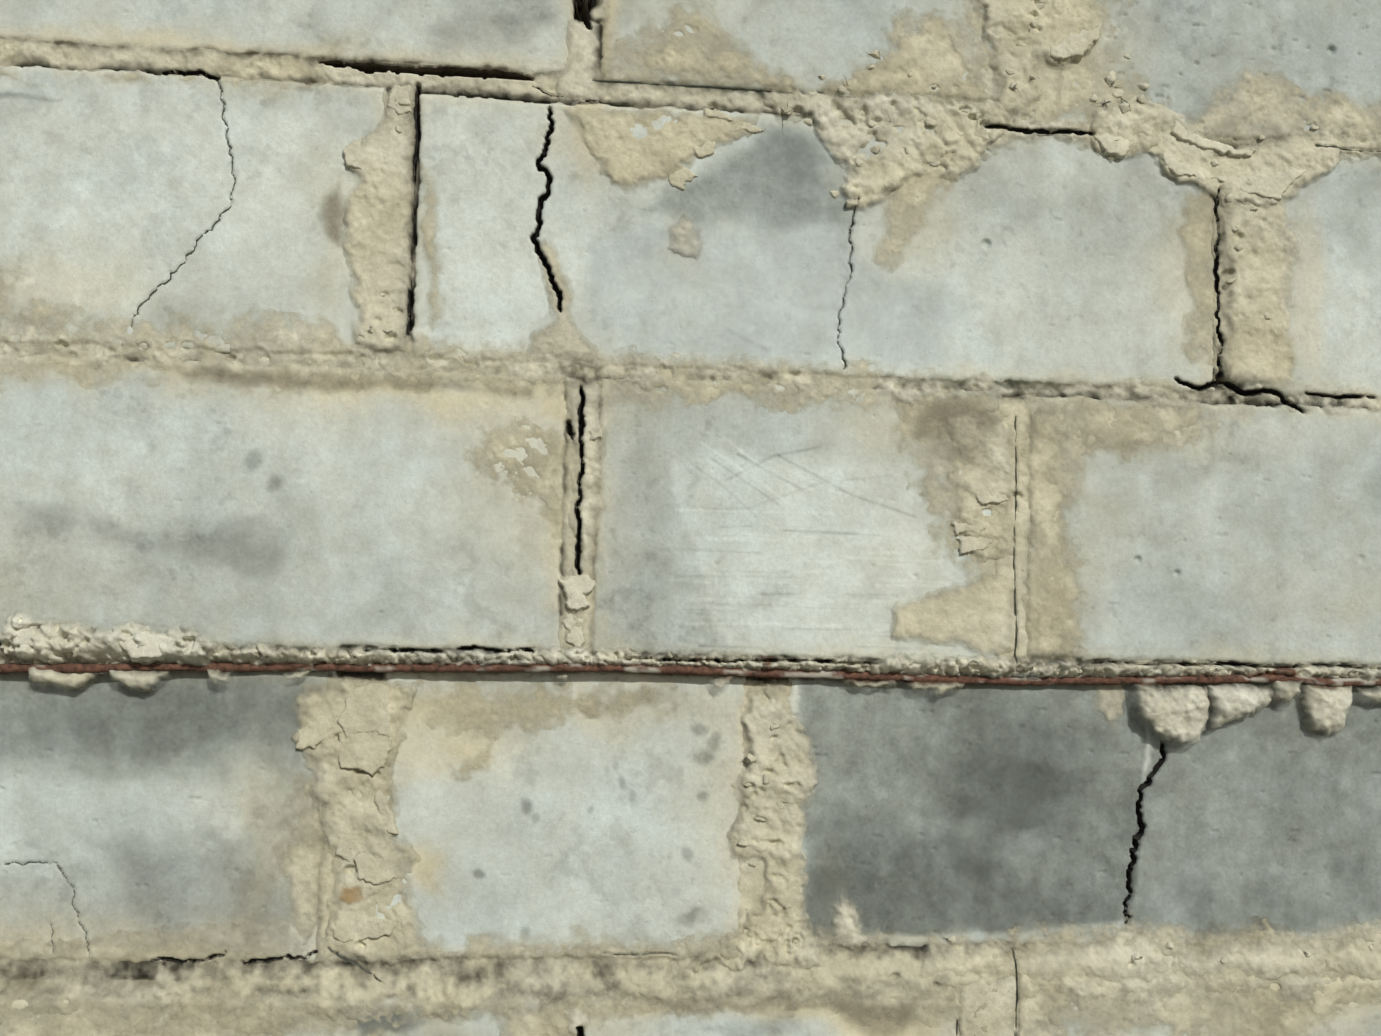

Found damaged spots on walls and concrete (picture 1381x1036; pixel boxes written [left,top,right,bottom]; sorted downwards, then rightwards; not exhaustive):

crack [131,80,236,327]
peeling [343,85,415,349]
crack [406,86,421,335]
crack [530,109,562,313]
peeling [764,0,1381,386]
crack [1174,188,1375,413]
crack [566,387,585,573]
peeling [812,410,1226,679]
peeling [293,653,443,962]
peeling [695,660,820,972]
crack [1123,743,1166,924]
peeling [927,922,1381,981]